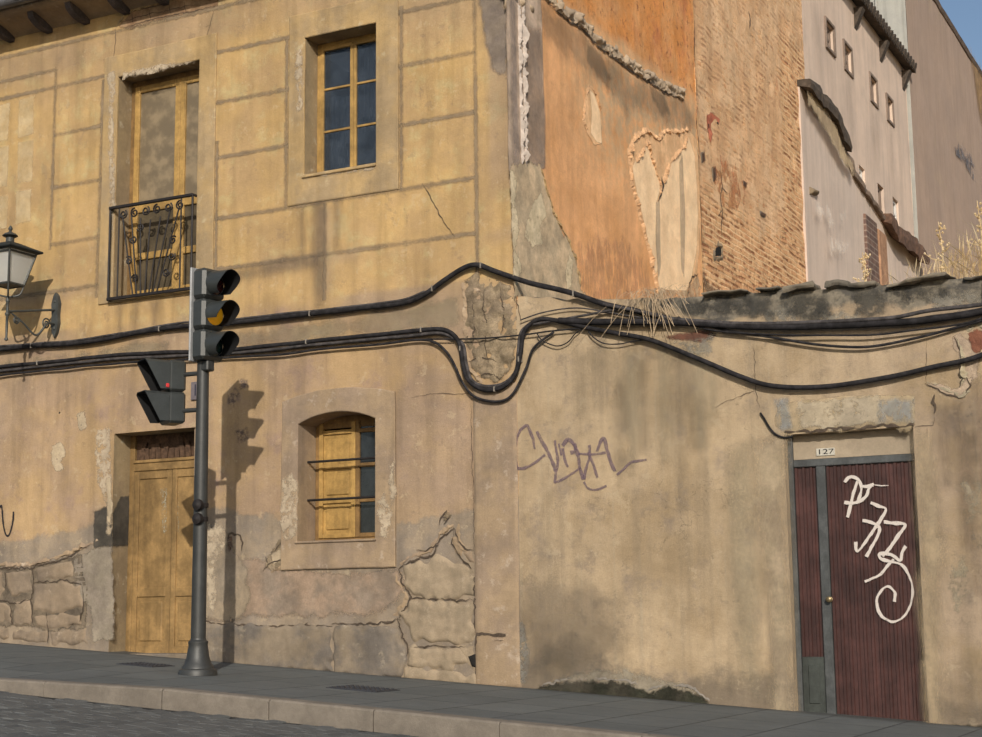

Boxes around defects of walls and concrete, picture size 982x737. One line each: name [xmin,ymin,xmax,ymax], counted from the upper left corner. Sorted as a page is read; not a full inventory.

peeling [582,84,602,145]
spalling [707,112,720,141]
peeling [627,126,747,305]
spalling [462,271,517,384]
spalling [925,323,982,413]
spalling [51,442,66,471]
peeling [95,428,113,534]
peeling [263,474,298,573]
peeling [377,462,396,537]